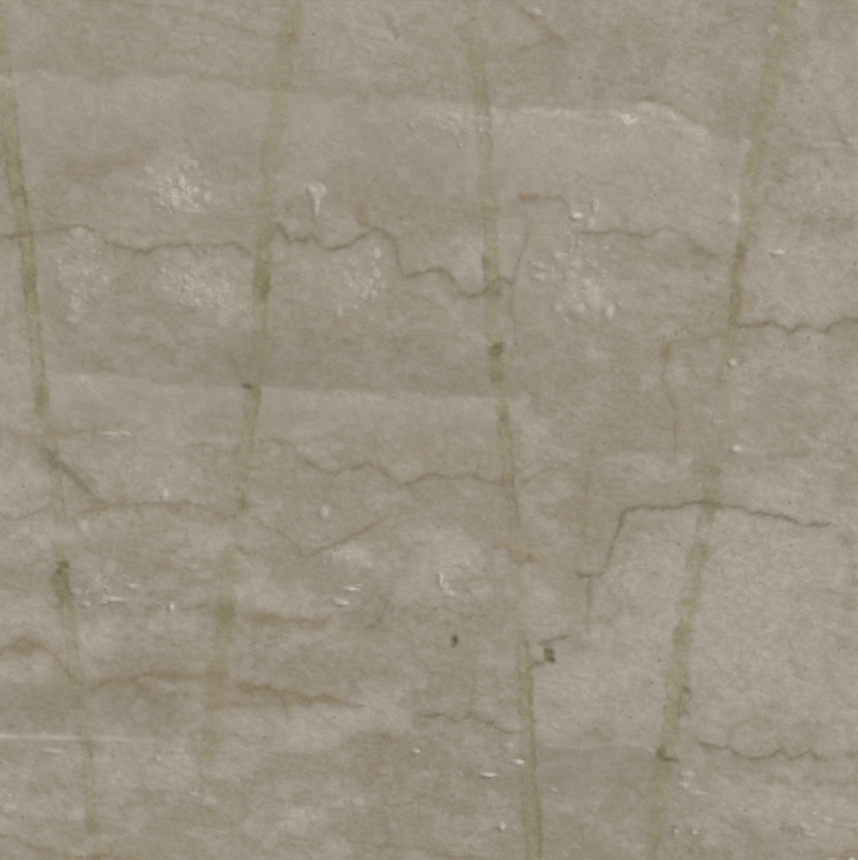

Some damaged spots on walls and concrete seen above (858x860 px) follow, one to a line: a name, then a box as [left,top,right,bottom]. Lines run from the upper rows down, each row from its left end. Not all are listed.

damp [385,98,720,176]
crack [271,223,512,301]
crack [734,257,858,332]
crack [609,501,847,557]